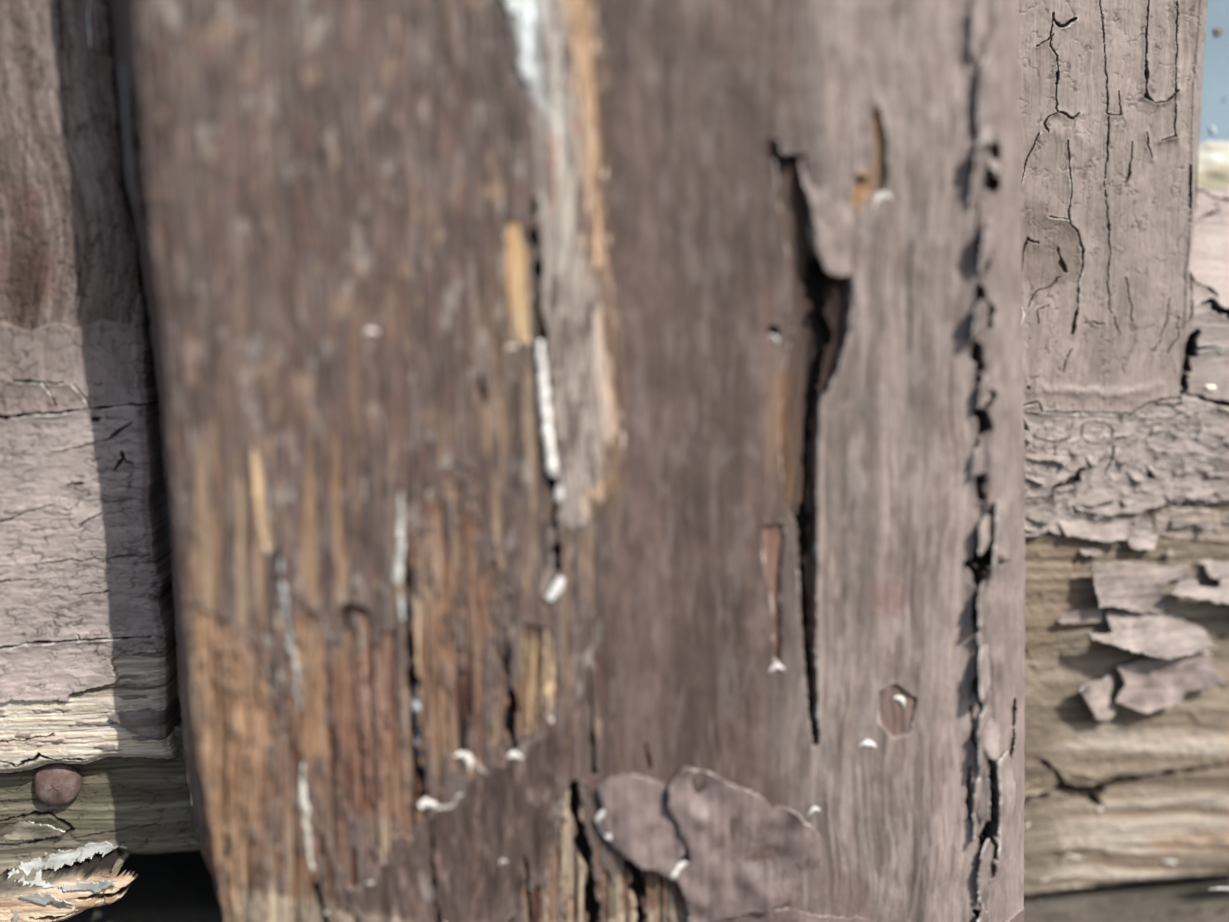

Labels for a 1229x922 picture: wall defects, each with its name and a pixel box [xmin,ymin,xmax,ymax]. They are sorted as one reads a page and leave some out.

peeling [0,0,144,332]
crack [527,196,550,341]
peeling [968,0,1005,205]
peeling [0,464,561,922]
crack [404,538,443,922]
crack [503,625,520,750]
crack [546,476,563,572]
peeling [545,576,565,601]
peeling [501,767,866,922]
crack [794,259,834,738]
crack [964,0,1229,876]
peeling [971,455,1229,922]